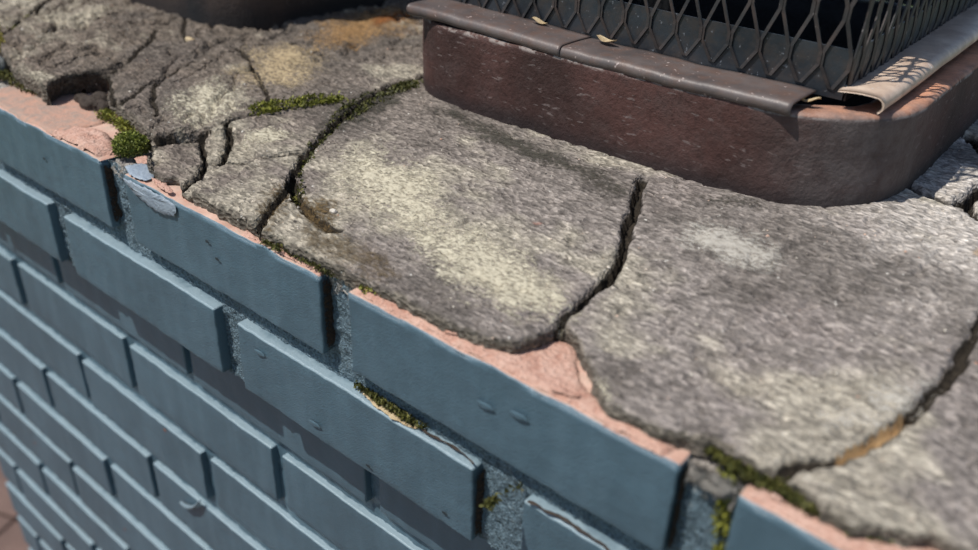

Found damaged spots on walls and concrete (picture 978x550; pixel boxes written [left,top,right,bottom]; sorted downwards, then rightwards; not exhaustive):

spalling [0,85,117,157]
peeling [123,156,176,217]
crack [107,18,235,193]
crack [234,44,271,101]
spalling [243,230,320,273]
crack [256,86,391,240]
leakage [317,80,411,141]
crack [553,181,648,342]
crack [911,188,978,221]
spalling [357,289,677,457]
crack [773,317,978,488]
spalling [684,456,935,550]